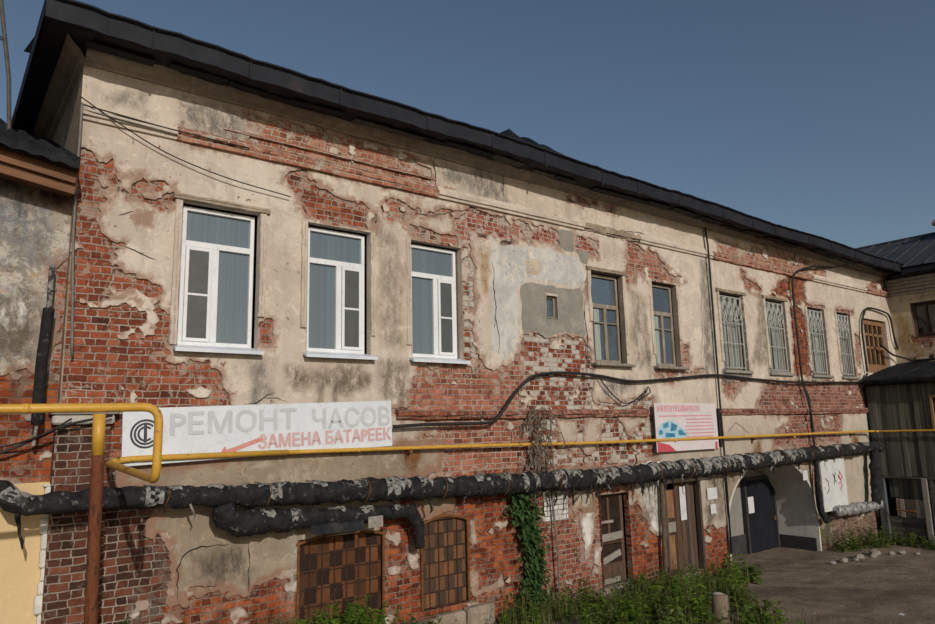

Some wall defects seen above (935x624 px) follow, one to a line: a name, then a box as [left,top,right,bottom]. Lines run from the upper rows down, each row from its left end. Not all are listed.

flaking render [0,148,660,488]
crack [492,264,500,351]
flaking render [625,241,682,285]
flaking render [716,239,871,449]
flaking render [99,505,311,624]
crack [176,542,250,597]
flaking render [235,482,669,624]
flaking render [700,474,730,576]
flaking render [817,509,883,550]